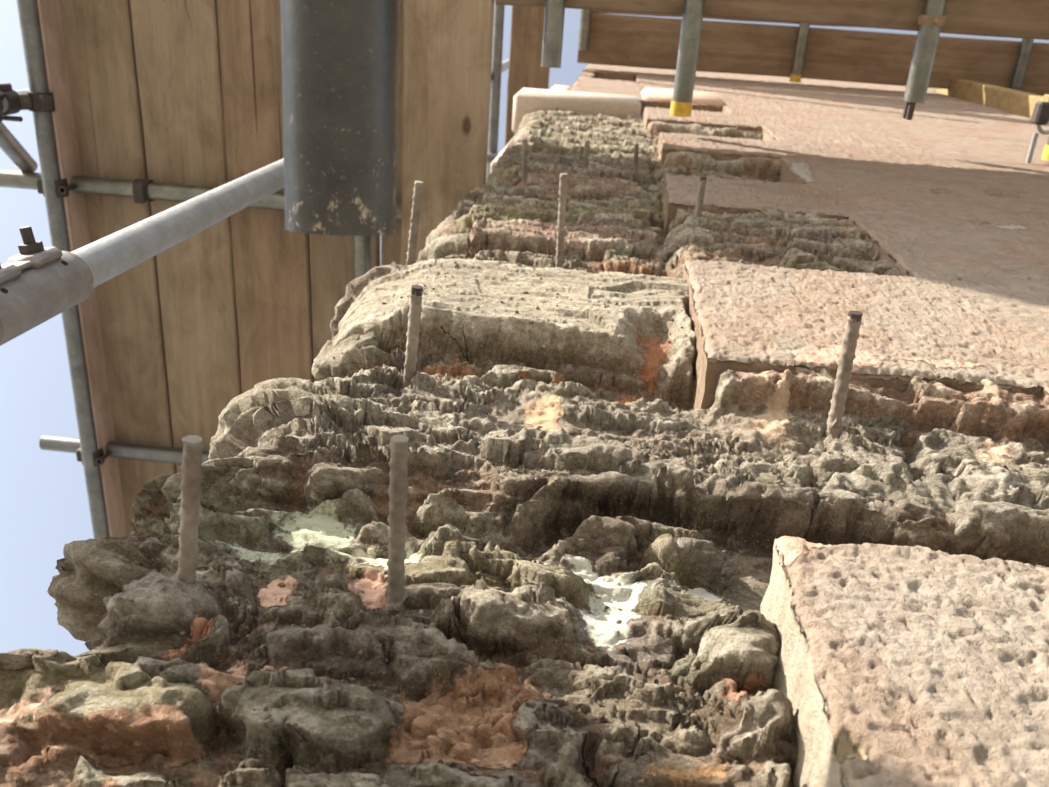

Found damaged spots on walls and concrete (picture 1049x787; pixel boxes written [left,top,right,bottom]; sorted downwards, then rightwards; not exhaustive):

rust [614,330,674,404]
rust [523,395,564,431]
spalling [976,437,1012,466]
leakage [221,491,388,570]
leakage [404,538,429,564]
spalling [776,536,823,567]
spalling [257,575,298,608]
spalling [347,568,388,611]
leakage [568,556,648,652]
spalling [720,666,767,702]
spalling [0,680,207,787]
spalling [386,663,547,769]